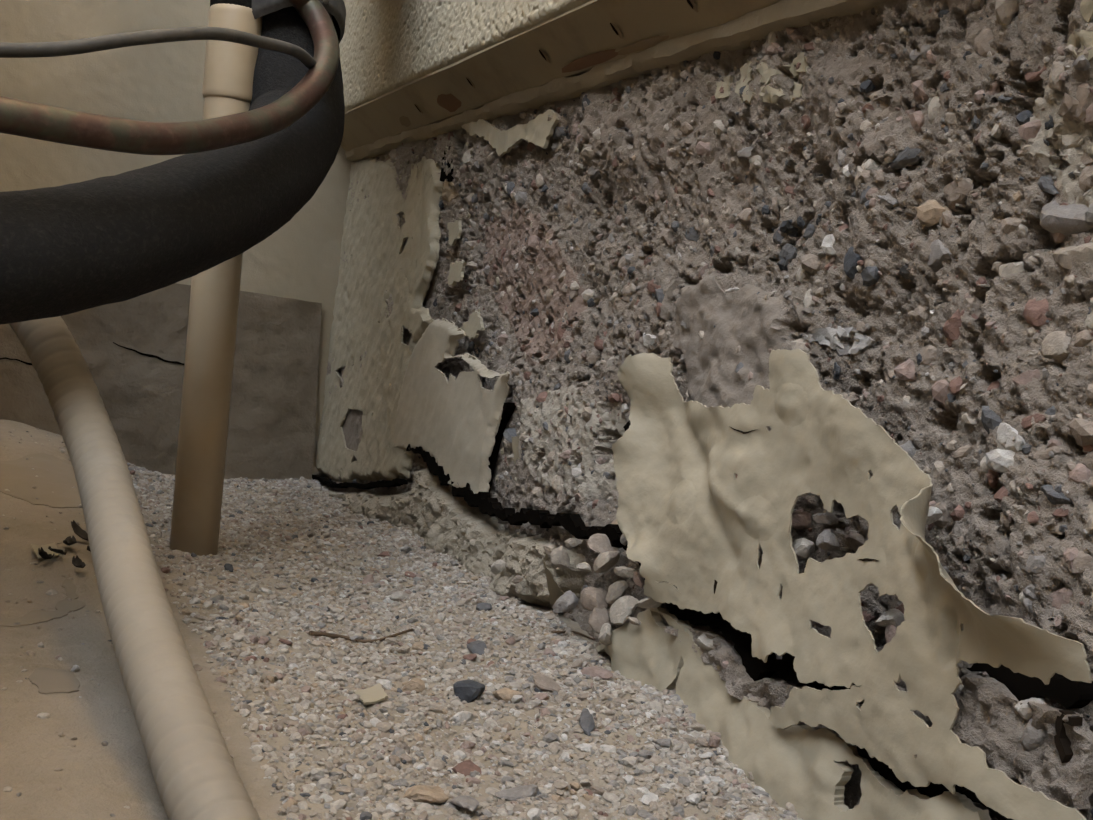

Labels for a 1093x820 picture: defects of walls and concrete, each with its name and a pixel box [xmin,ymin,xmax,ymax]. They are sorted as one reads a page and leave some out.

spalling [342,409,363,461]
spalling [325,454,428,495]
spalling [347,0,1093,820]
crack [966,663,1093,763]
crack [832,730,1014,820]